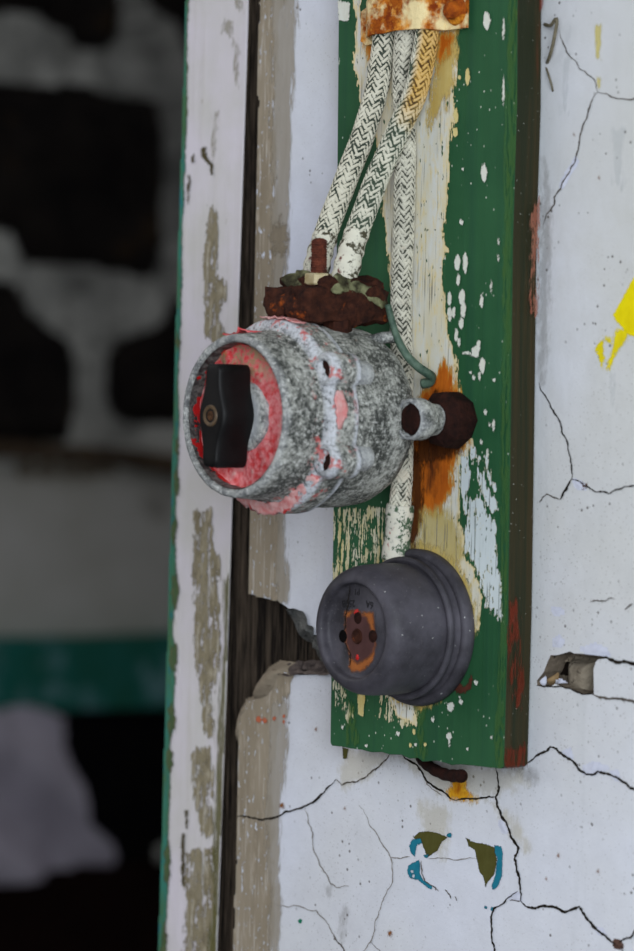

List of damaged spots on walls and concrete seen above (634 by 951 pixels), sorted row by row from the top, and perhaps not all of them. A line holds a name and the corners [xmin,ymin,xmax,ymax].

peeling [254,0,298,323]
peeling [338,0,370,103]
peeling [412,55,495,398]
crack [543,35,634,224]
peeling [158,0,221,951]
corrosion [419,357,462,400]
corrosion [410,439,476,614]
peeling [411,438,503,632]
crack [539,384,634,503]
peeling [233,510,353,951]
crack [237,754,634,951]
crack [528,746,634,790]